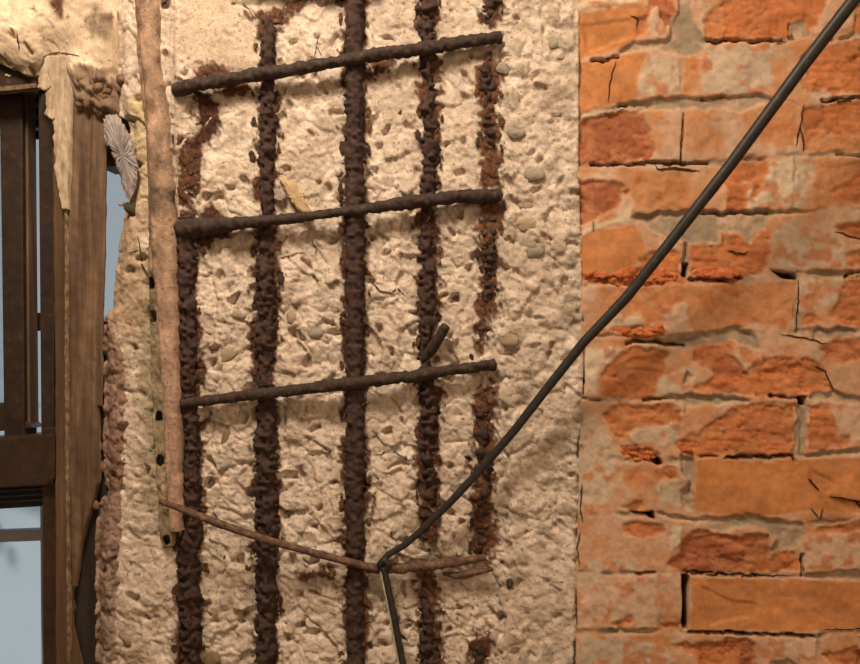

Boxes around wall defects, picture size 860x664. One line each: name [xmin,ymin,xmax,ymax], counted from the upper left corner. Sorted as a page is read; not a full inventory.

corrosion [170,80,263,218]
corrosion [239,0,307,65]
corrosion [474,51,505,189]
crack [796,104,805,151]
crack [826,94,855,102]
corrosion [246,225,284,382]
spalling [171,0,521,664]
corrosion [469,201,506,361]
spalling [92,320,129,664]
corrosion [466,384,501,560]
crack [808,479,860,520]
crack [704,628,860,637]